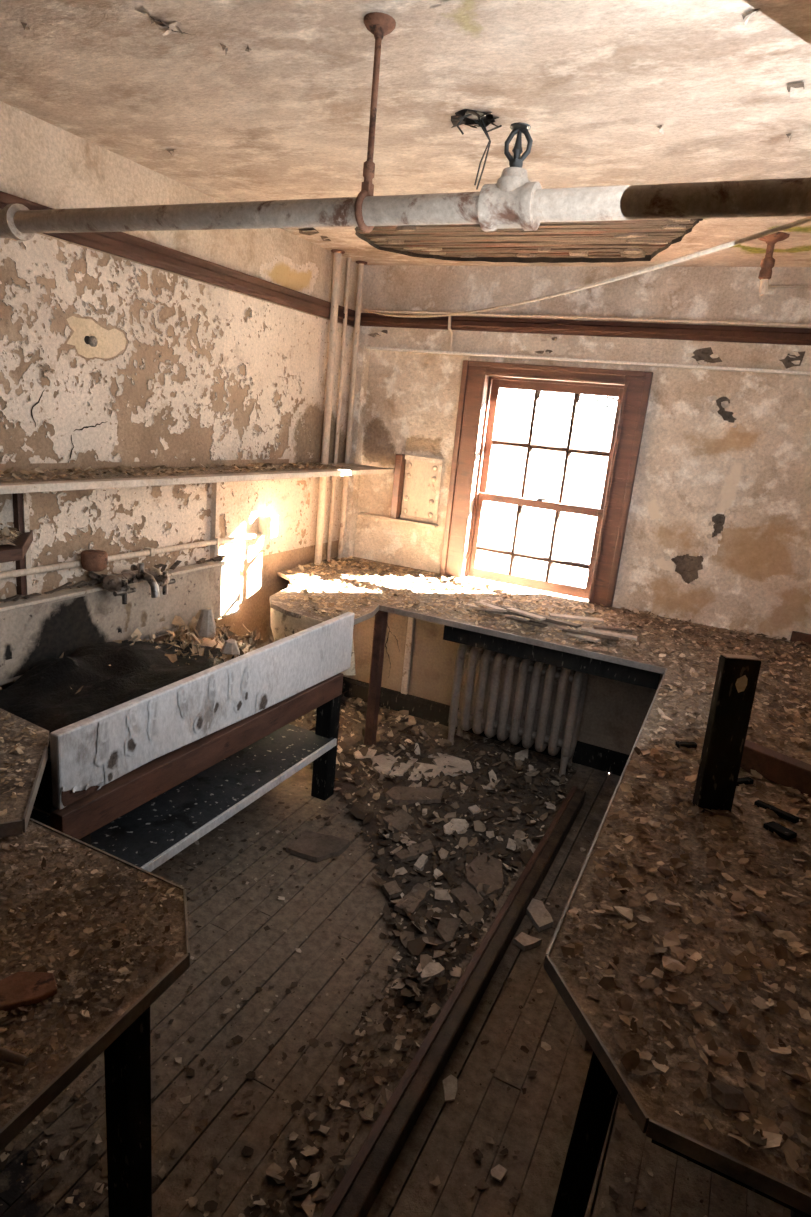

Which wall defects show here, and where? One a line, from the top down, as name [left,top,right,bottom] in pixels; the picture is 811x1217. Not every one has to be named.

peeling [134,6,191,36]
spalling [298,227,331,241]
flaking render [355,219,703,263]
flaking render [518,336,571,356]
flaking render [686,347,722,365]
flaking render [779,351,806,369]
peeling [0,233,396,599]
flaking render [710,393,740,428]
flaking render [652,510,730,586]
peeling [0,711,38,816]
peeling [276,556,811,1180]
peeling [0,821,180,1111]